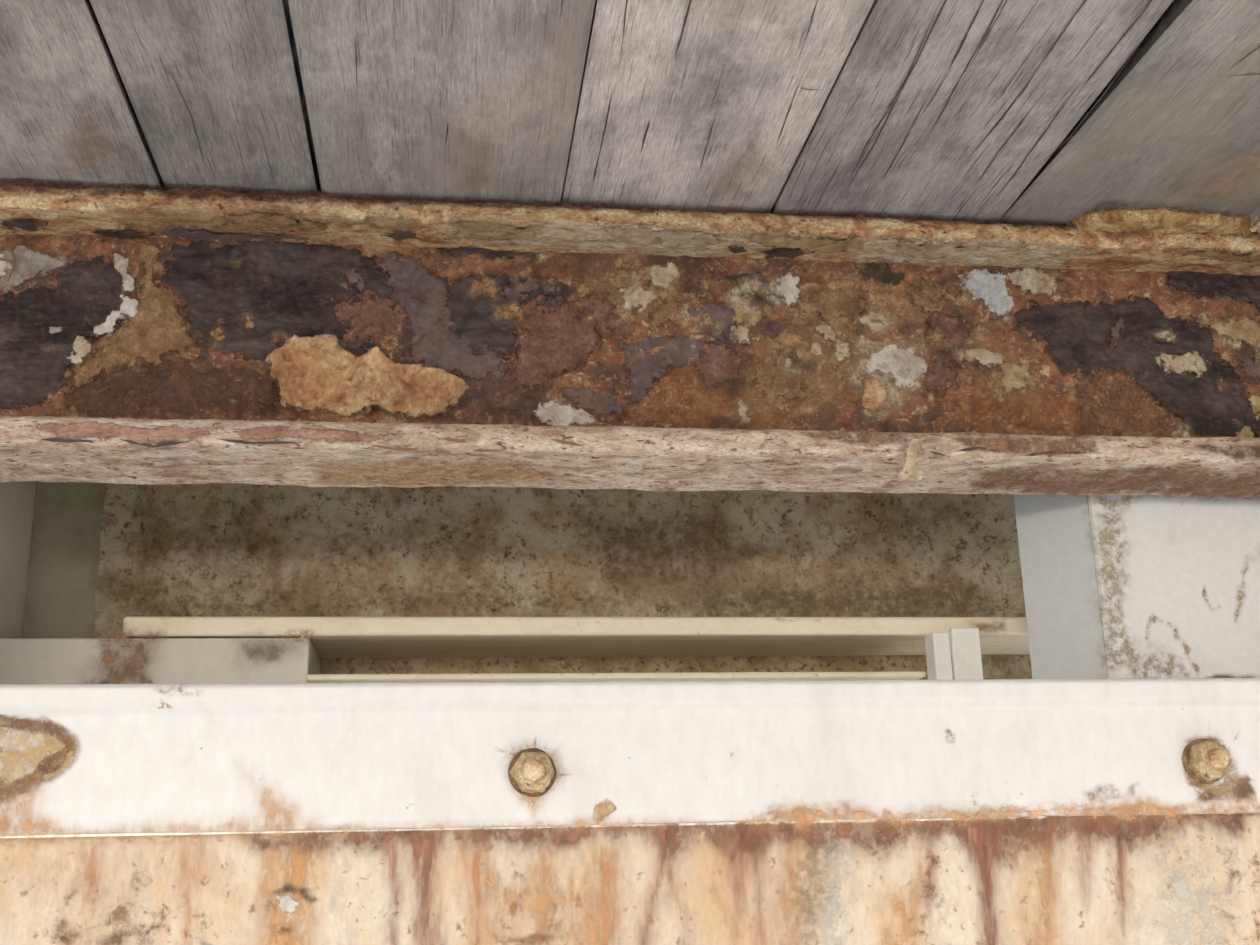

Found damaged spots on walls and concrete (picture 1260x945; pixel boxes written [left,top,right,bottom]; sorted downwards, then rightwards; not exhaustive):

spalling [0,244,139,410]
rust [0,179,425,205]
spalling [110,207,589,382]
rust [36,236,1041,446]
rust [442,198,686,212]
spalling [450,218,1260,438]
rust [1016,207,1260,238]
rust [316,461,565,486]
rust [956,374,1260,500]
water stain [1095,496,1186,675]
rust [229,739,1254,945]
rust [103,906,166,945]